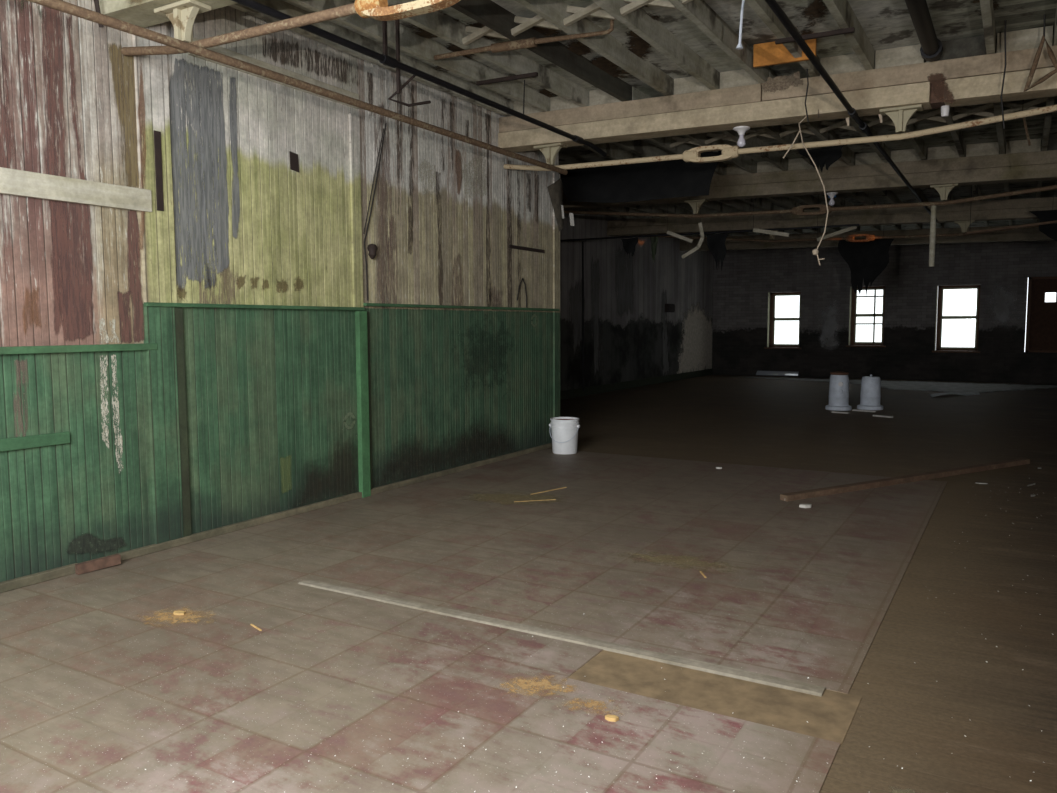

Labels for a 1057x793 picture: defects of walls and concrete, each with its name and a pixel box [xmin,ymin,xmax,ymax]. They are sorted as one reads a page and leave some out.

peeling [0,55,16,169]
peeling [42,6,85,180]
peeling [49,200,144,473]